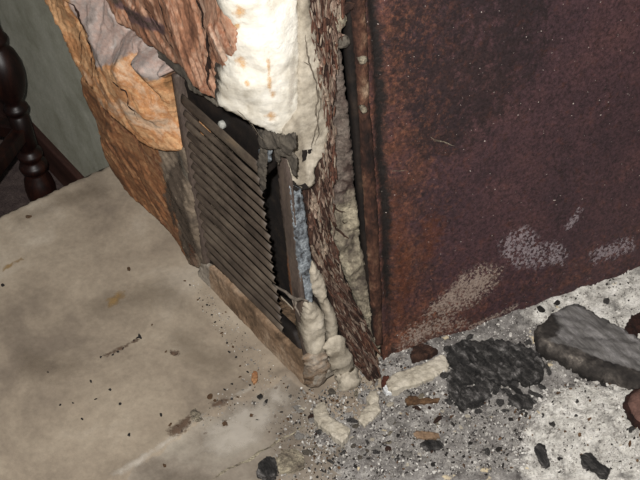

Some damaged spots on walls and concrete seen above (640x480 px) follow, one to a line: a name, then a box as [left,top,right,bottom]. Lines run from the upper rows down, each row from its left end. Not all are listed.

peeling [256,128,312,205]
leakage [397,264,517,350]